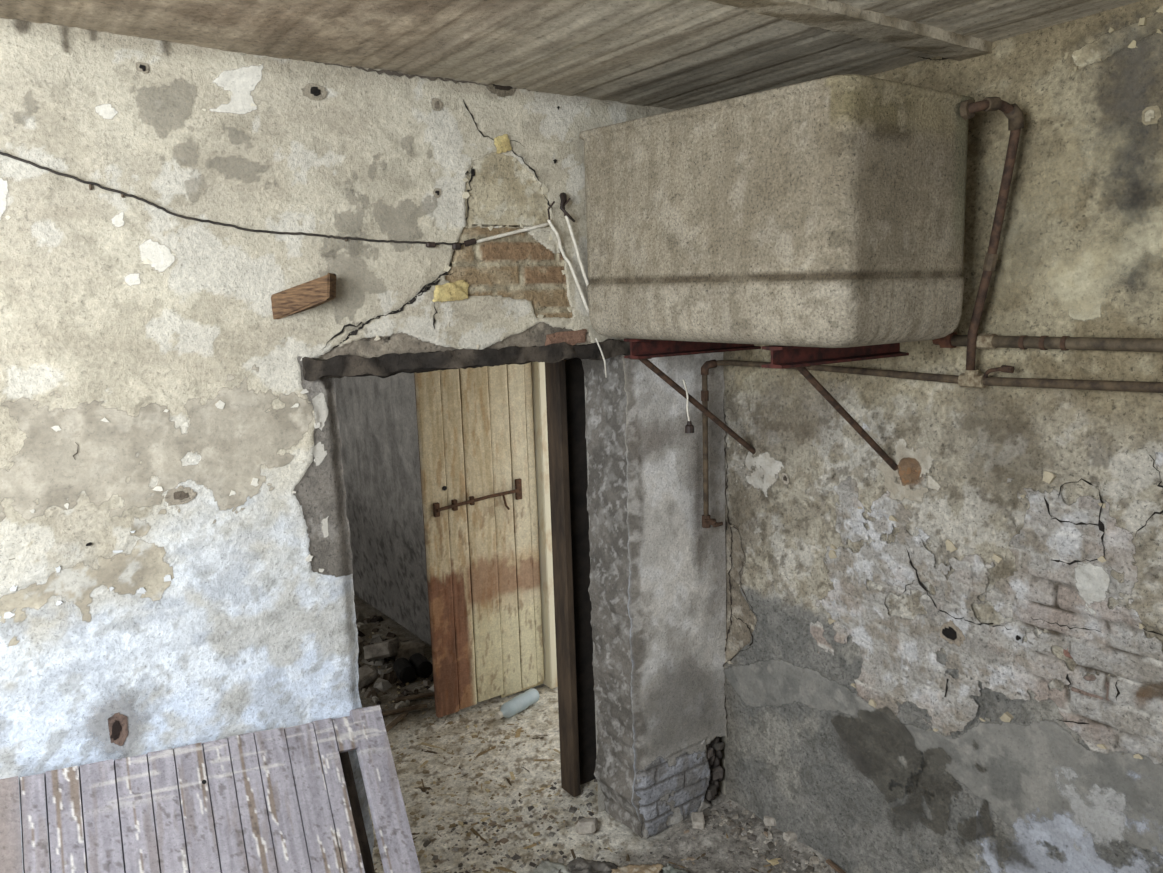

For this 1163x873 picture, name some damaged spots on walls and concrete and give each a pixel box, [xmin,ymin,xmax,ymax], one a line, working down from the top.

crack [289,58,552,208]
crack [320,252,454,351]
crack [465,166,473,228]
flaking render [444,152,591,350]
water stain [1047,200,1163,311]
peeling [0,332,457,623]
crack [1044,478,1105,565]
crack [1135,455,1163,536]
flaking render [810,471,1163,764]
crack [902,548,1100,632]
flaking render [634,736,724,839]
water stain [831,706,1157,873]